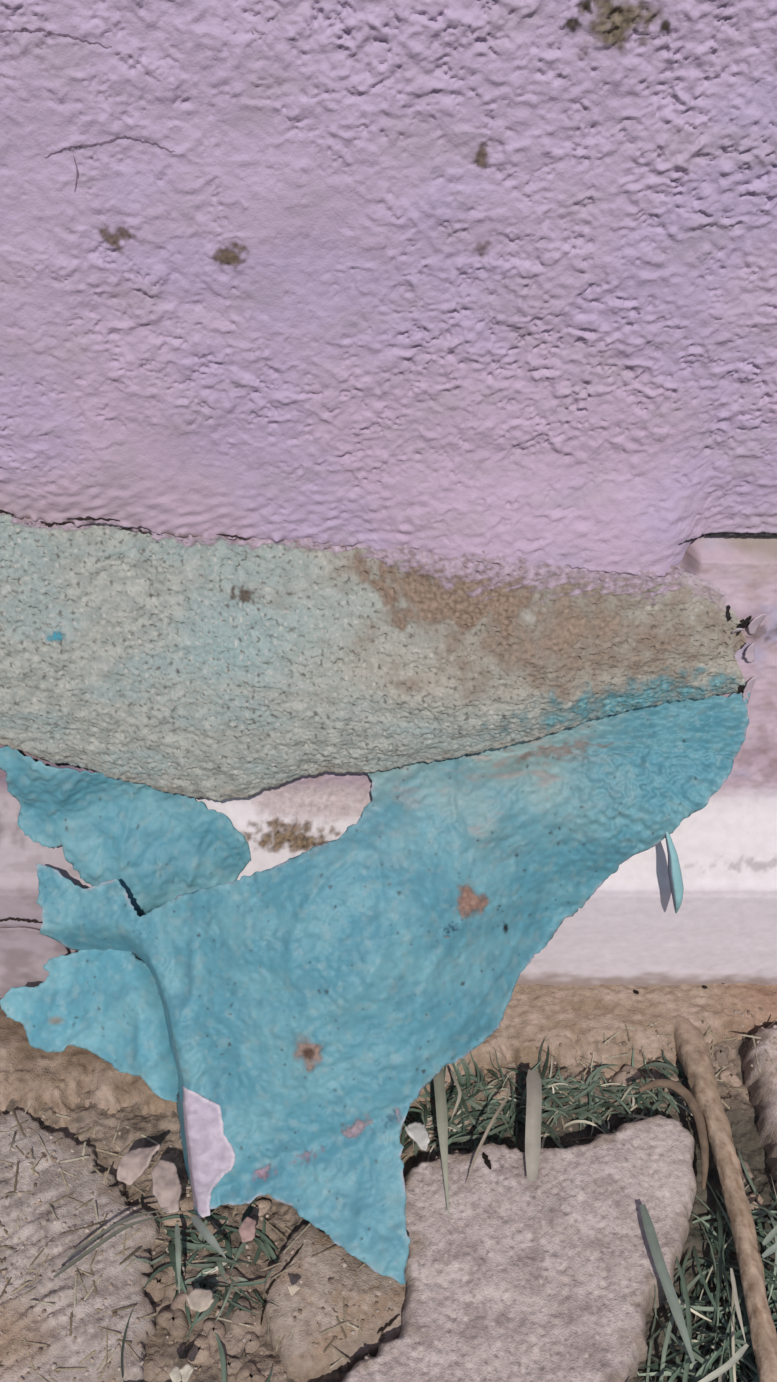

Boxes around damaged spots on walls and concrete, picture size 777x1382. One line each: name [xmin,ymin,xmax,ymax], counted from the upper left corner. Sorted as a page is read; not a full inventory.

crack [0,509,162,536]
crack [216,533,250,541]
peeling [0,513,750,1284]